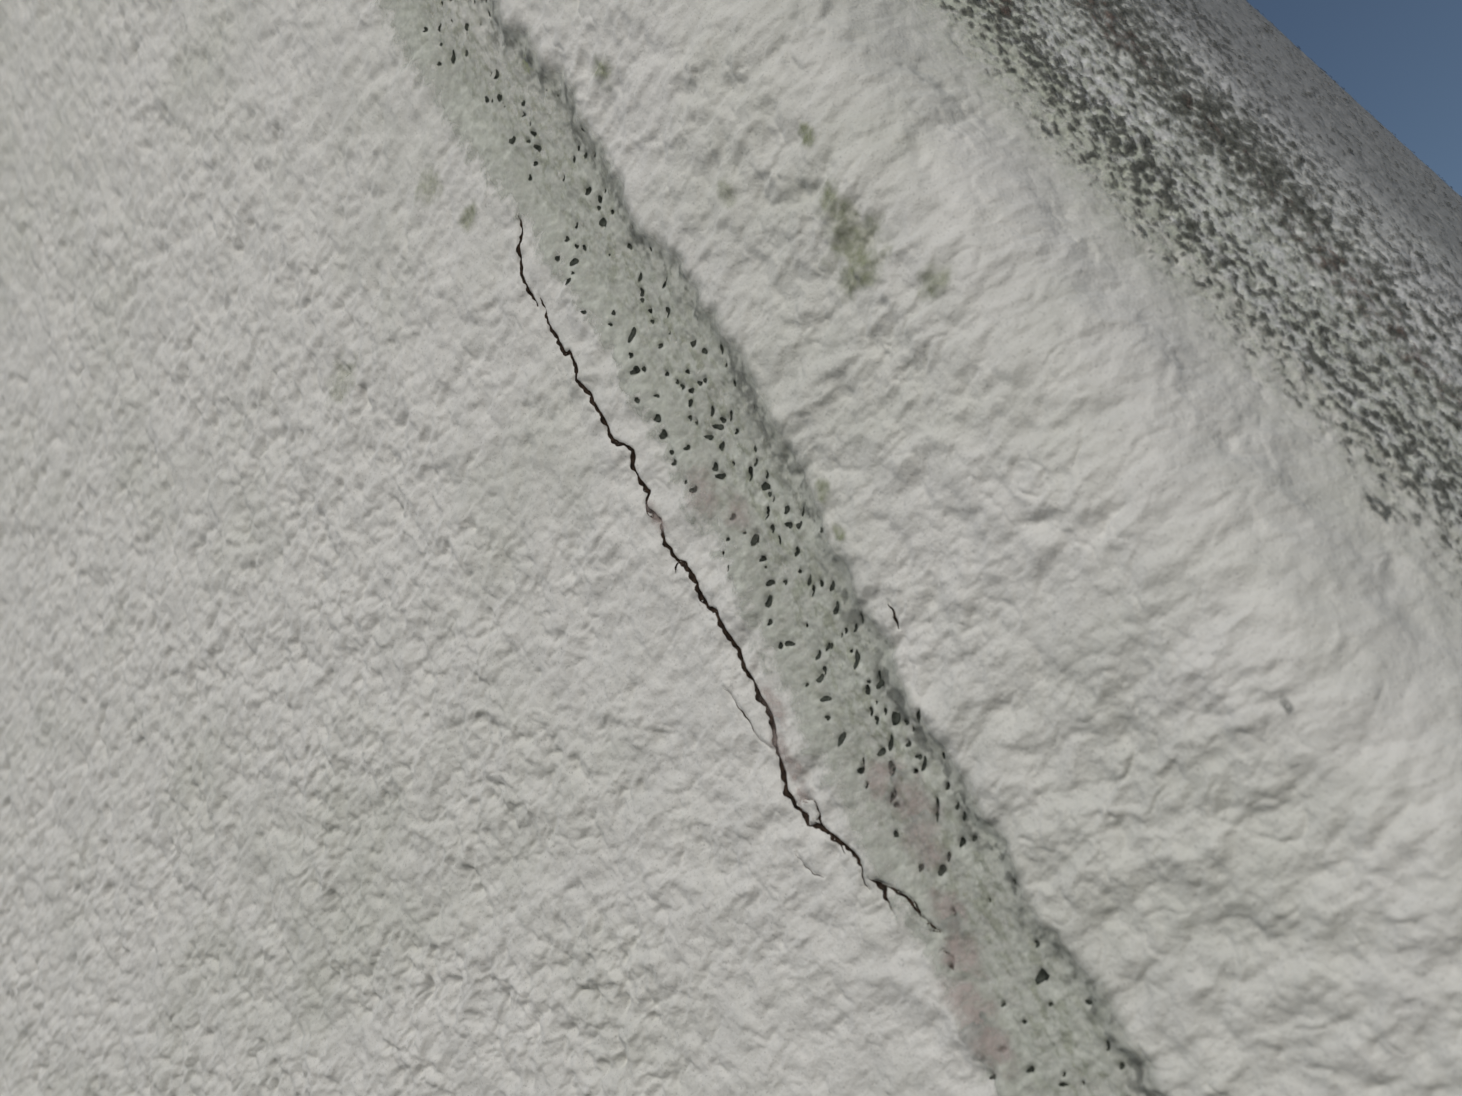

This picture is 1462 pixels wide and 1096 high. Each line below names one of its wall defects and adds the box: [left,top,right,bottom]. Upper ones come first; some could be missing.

crack [516,215,955,969]
leakage [1365,493,1396,520]